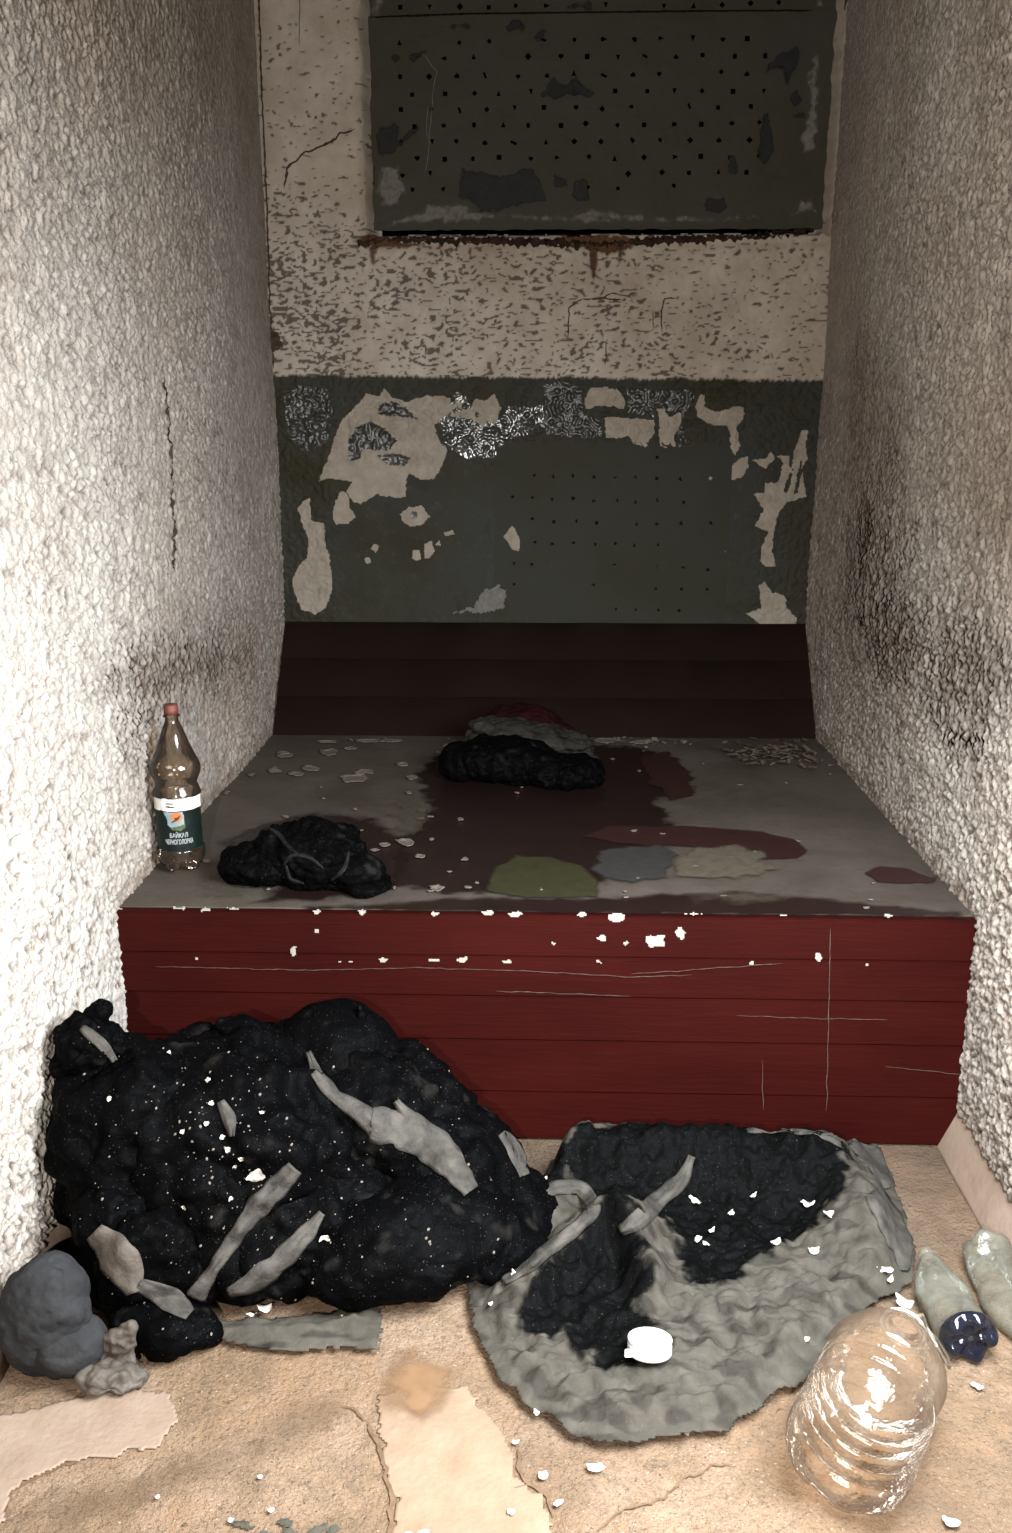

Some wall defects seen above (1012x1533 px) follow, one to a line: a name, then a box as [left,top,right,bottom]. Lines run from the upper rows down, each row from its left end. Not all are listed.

rust [356,234,424,263]
rust [558,235,637,278]
peeling [292,389,507,615]
peeling [585,387,808,624]
peeling [504,527,520,551]